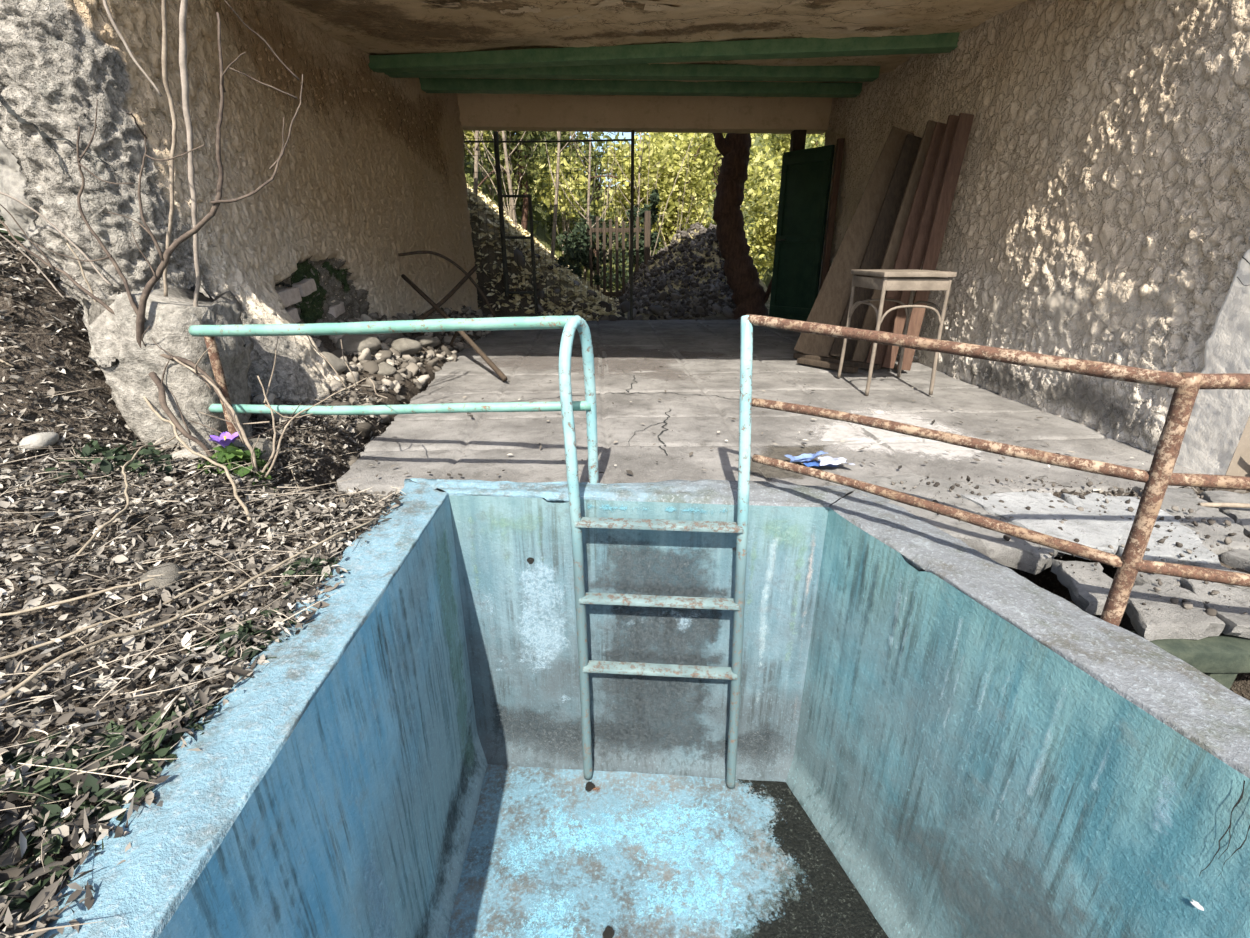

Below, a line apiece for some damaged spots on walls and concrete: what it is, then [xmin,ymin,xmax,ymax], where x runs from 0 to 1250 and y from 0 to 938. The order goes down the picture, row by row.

peeling [420,0,541,17]
peeling [590,0,681,11]
crack [513,367,740,455]
water stain [494,536,776,761]
water stain [417,727,474,938]
water stain [731,779,889,938]
crack [1199,781,1250,876]